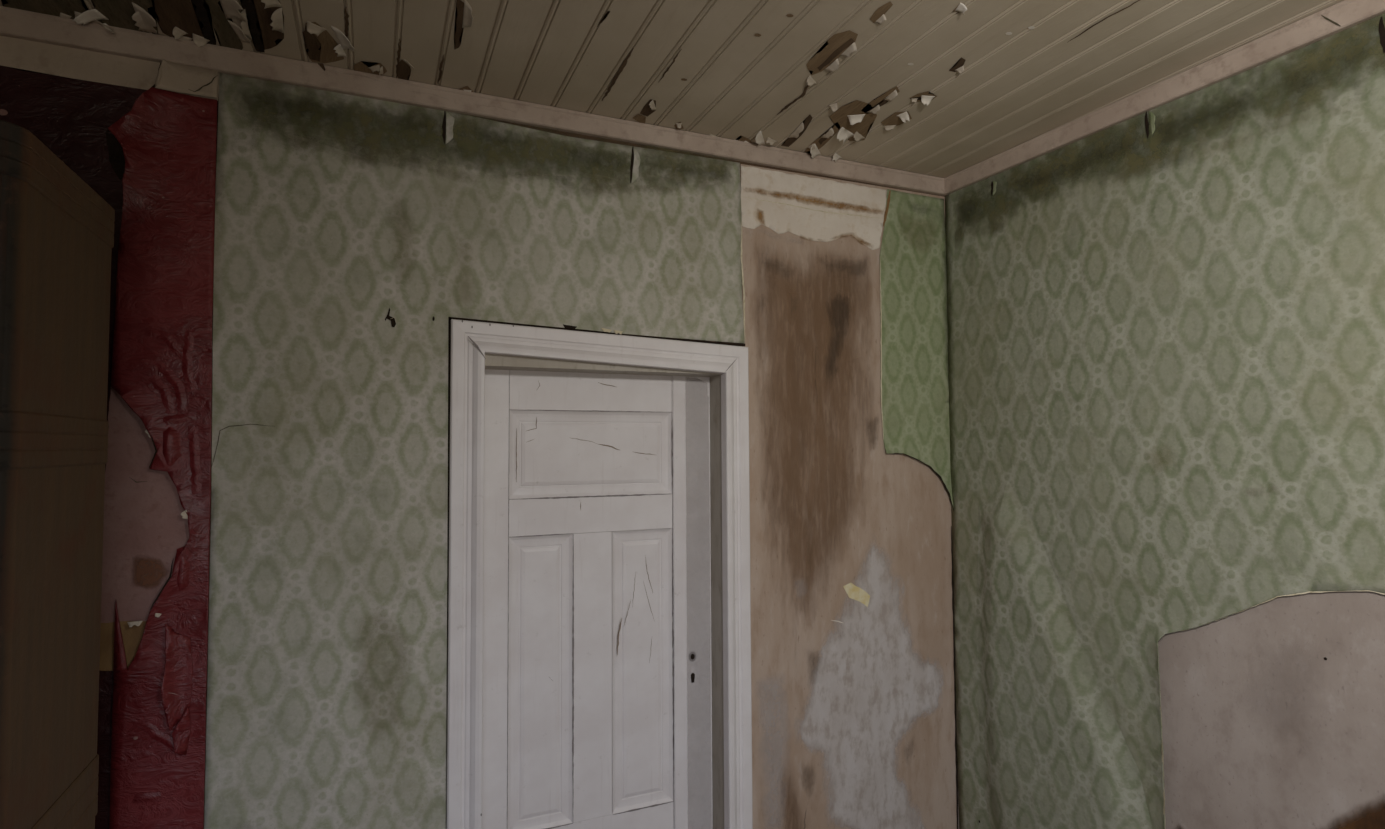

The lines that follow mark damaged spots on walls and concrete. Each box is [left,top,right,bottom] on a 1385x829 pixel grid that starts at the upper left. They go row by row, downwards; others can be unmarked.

peeling [1,0,284,53]
peeling [302,21,415,80]
peeling [454,0,473,49]
peeling [806,30,858,87]
leakage [243,90,727,190]
peeling [734,86,945,212]
leakage [957,14,1385,239]
leakage [768,264,856,590]
peeling [99,387,189,671]
peeling [741,209,957,829]
peeling [1158,590,1385,829]
leakage [1332,801,1385,829]